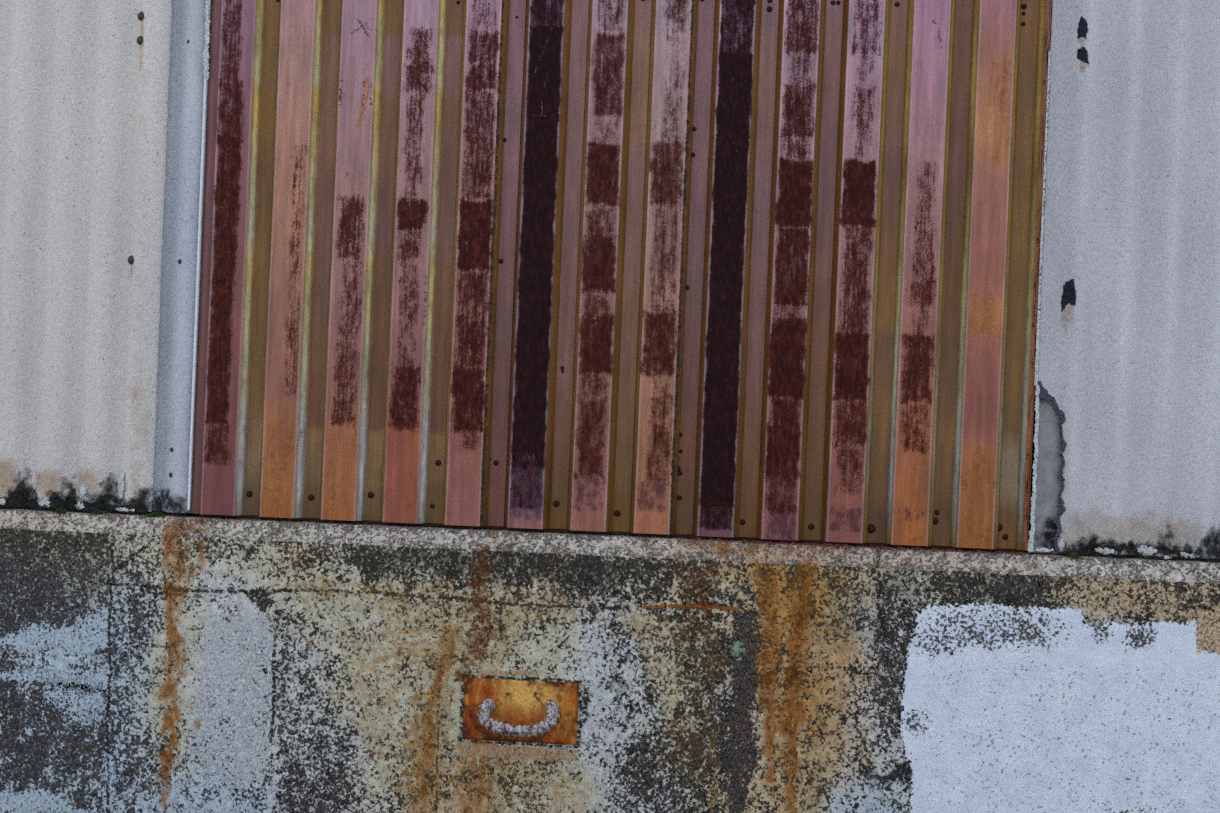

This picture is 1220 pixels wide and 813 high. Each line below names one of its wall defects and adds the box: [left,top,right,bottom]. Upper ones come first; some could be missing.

damp [0,472,187,517]
corrosion [202,0,245,467]
corrosion [450,0,501,450]
corrosion [510,0,564,520]
corrosion [574,0,626,511]
corrosion [699,0,756,530]
corrosion [764,0,819,540]
corrosion [833,0,881,494]
peeling [1027,51,1066,553]
peeling [899,579,1220,813]
spalling [1061,279,1076,320]
damp [1041,518,1220,563]